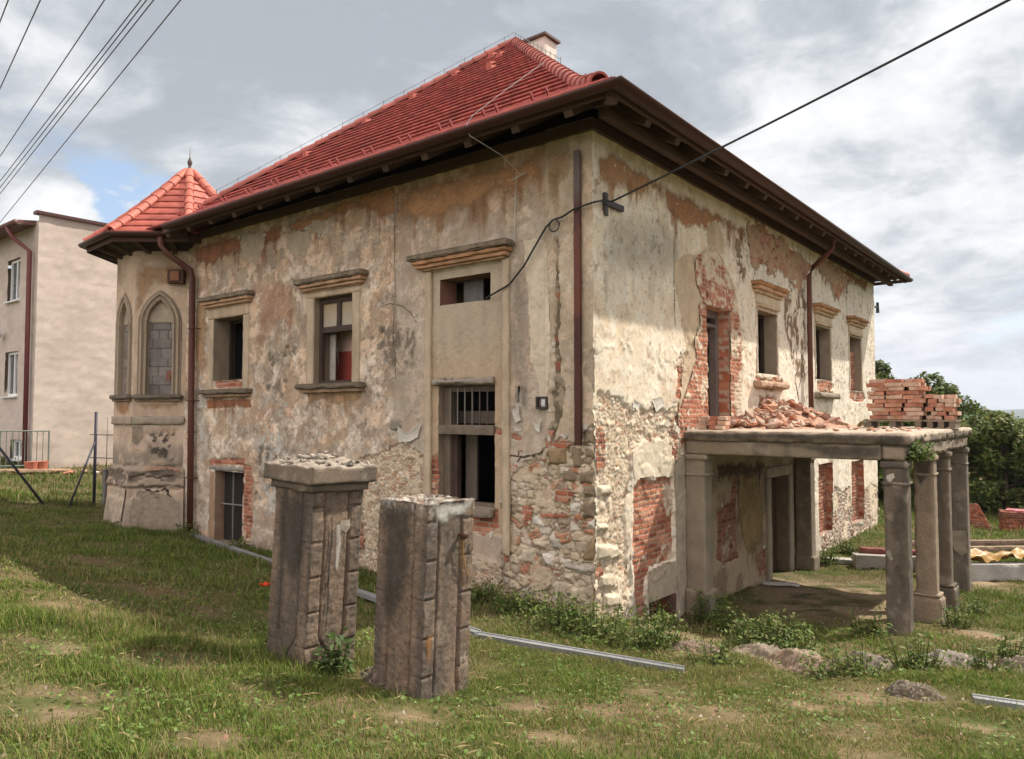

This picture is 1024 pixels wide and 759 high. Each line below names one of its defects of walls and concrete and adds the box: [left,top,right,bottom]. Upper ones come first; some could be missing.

spalling [131,426,143,444]
spalling [276,420,439,572]
flaking render [473,215,849,623]
spalling [849,391,865,402]